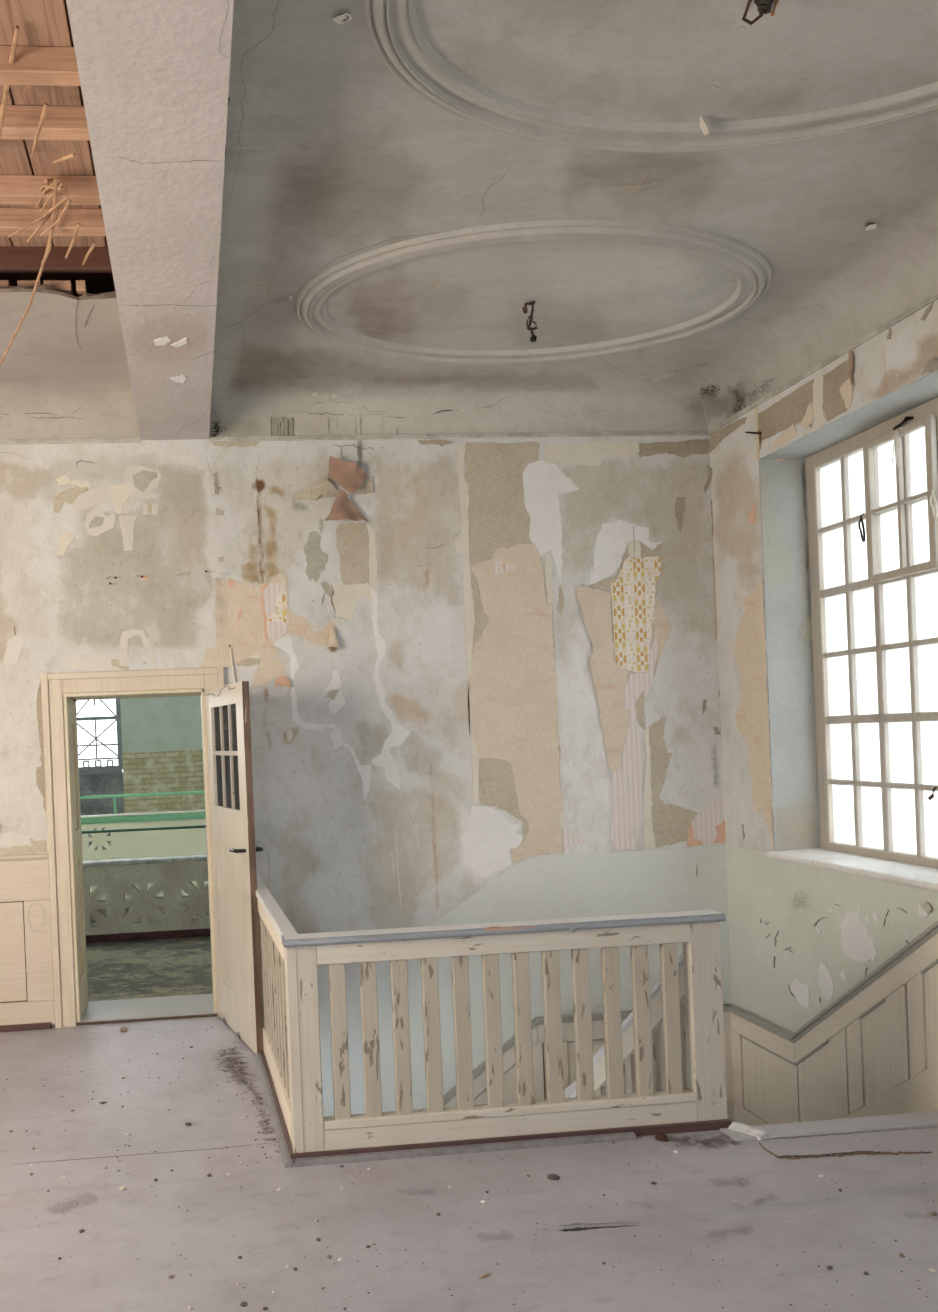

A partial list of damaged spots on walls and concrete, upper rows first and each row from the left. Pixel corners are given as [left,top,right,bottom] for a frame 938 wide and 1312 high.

crack [94,0,279,217]
flaking render [638,359,855,458]
flaking render [3,636,25,665]
flaking render [73,465,161,551]
flaking render [273,583,410,802]
flaking render [417,439,579,673]
flaking render [589,519,672,685]
flaking render [675,497,686,532]
flaking render [460,757,554,877]
flaking render [635,690,698,848]
peeling [789,907,879,1008]
crack [759,1142,932,1159]